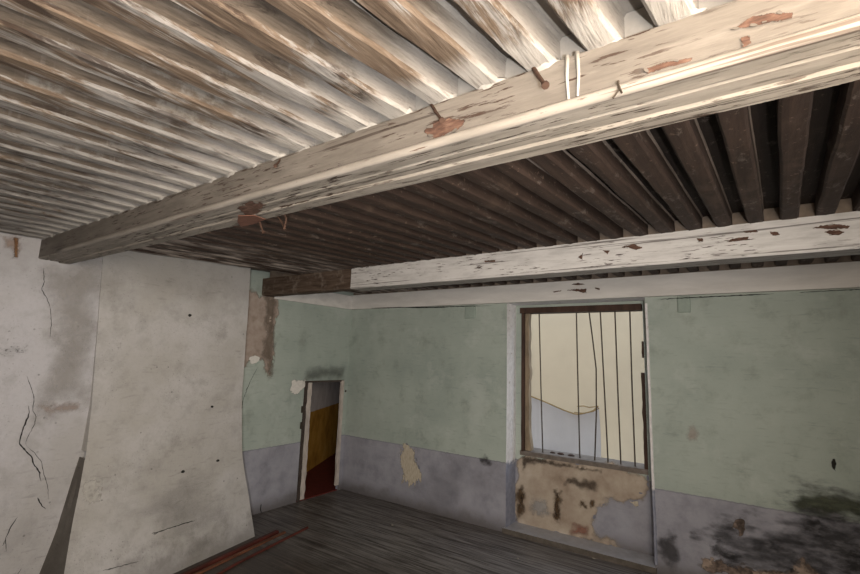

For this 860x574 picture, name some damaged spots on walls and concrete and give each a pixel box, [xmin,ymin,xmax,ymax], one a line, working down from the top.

peeling [815,223,850,236]
flaking render [244,290,279,374]
crack [19,377,49,508]
peeling [398,443,421,489]
peeling [515,456,649,547]
leakage [658,537,678,562]
spalling [702,557,819,574]
leakage [713,492,860,574]